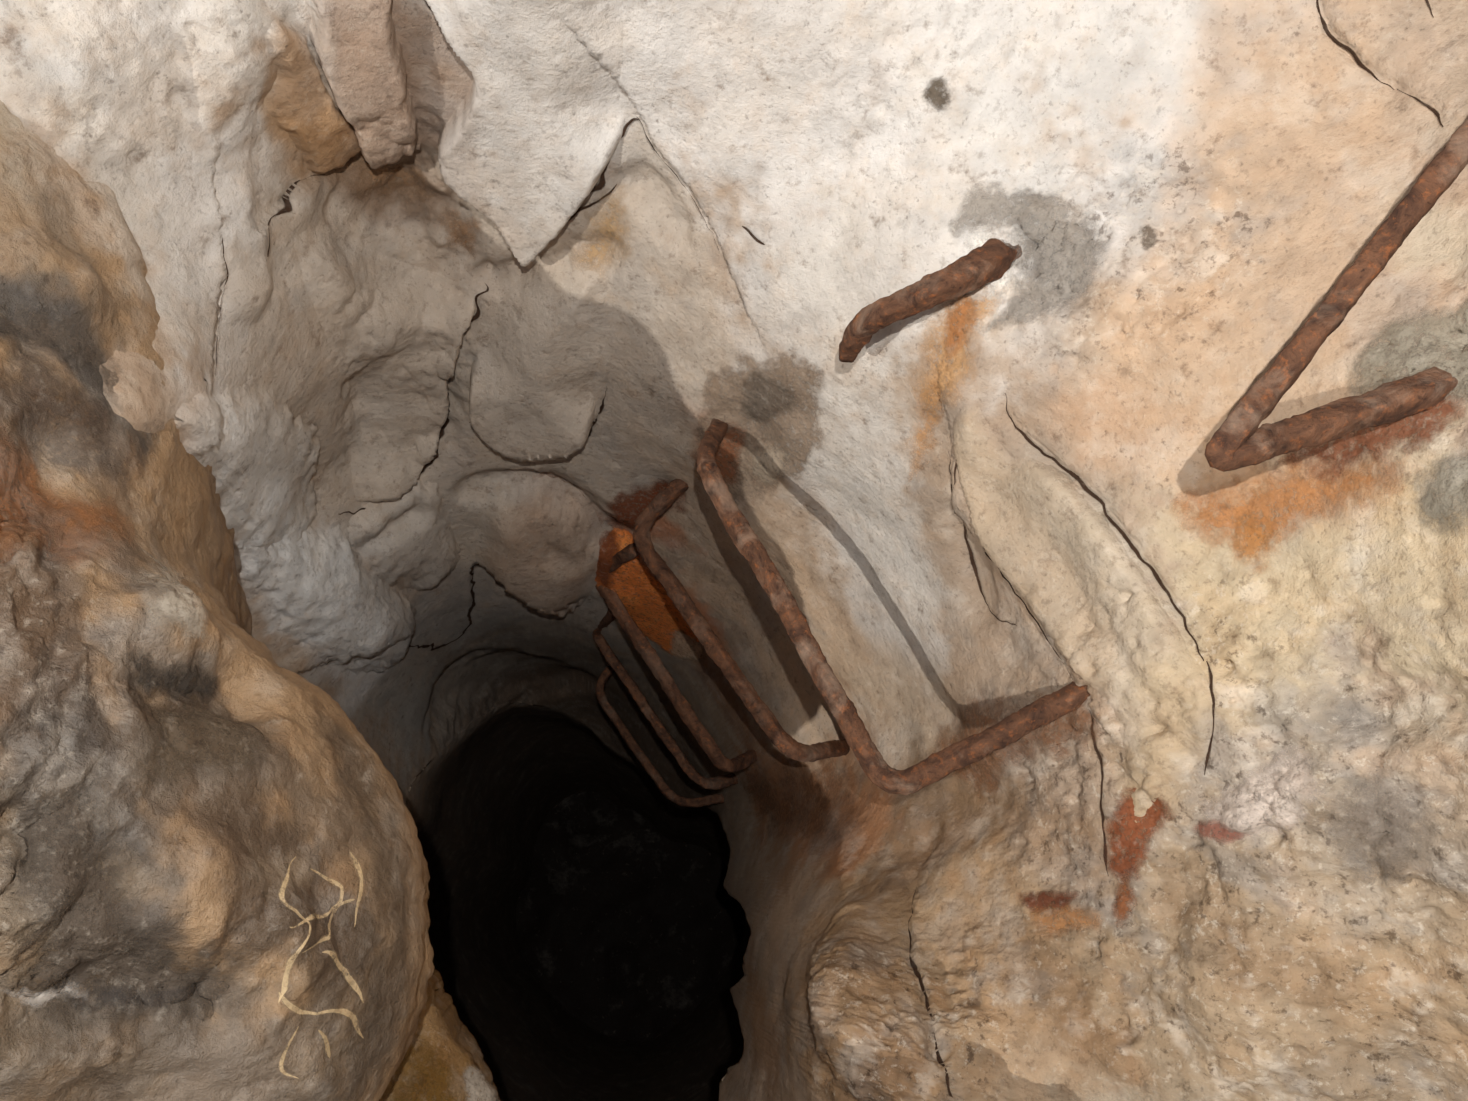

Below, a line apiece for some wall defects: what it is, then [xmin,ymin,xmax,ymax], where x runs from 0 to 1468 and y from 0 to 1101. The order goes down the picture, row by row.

crack [1316,0,1444,127]
crack [568,116,765,252]
damp [0,309,126,474]
crack [420,393,470,474]
crack [471,285,489,322]
rust [916,297,992,453]
rust [1181,392,1458,557]
rust [595,480,702,660]
crack [1005,393,1215,775]
rust [1023,891,1091,931]
rust [1107,788,1167,919]
crack [908,887,952,1097]